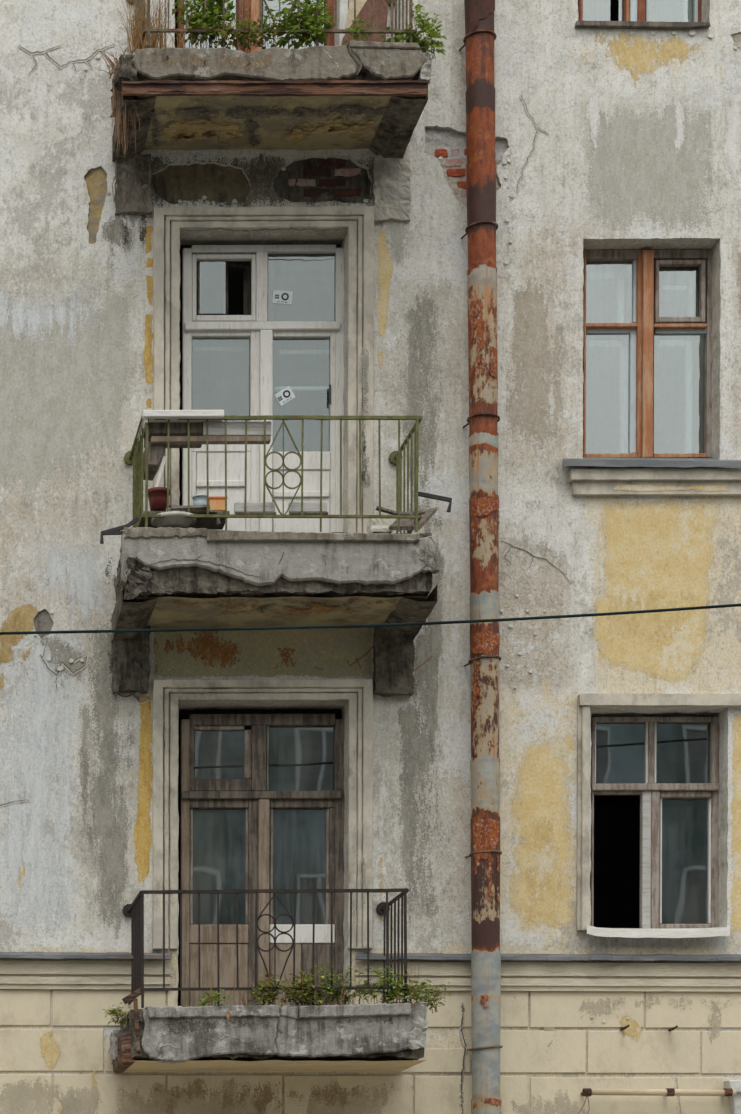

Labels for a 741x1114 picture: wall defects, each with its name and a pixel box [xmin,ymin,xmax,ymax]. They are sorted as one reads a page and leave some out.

corrosion [464,0,495,32]
crack [18,44,115,76]
spalling [84,166,110,244]
spalling [152,163,251,204]
spalling [273,157,371,204]
spalling [425,127,467,207]
corrosion [470,296,498,377]
corrosion [471,496,500,547]
peeling [606,589,705,650]
corrosion [471,631,500,722]
crack [0,799,29,807]
corrosion [473,818,500,902]